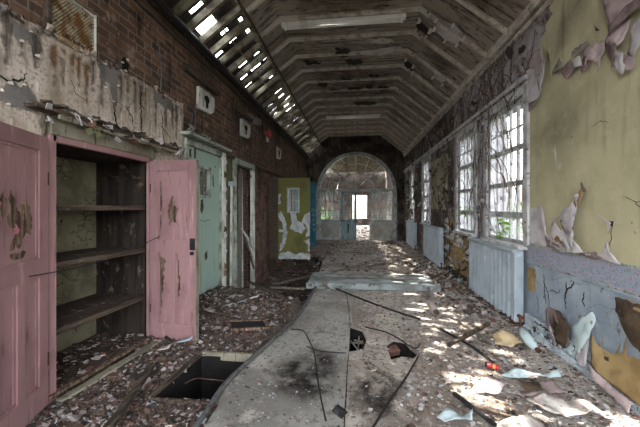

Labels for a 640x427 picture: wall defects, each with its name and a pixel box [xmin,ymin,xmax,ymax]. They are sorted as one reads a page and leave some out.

crack [0,73,27,82]
flaking render [0,0,183,113]
peeling [496,0,640,112]
leakage [155,104,182,139]
peeling [425,74,500,286]
peeling [278,194,310,260]
crack [534,275,589,357]
peeling [532,306,597,358]